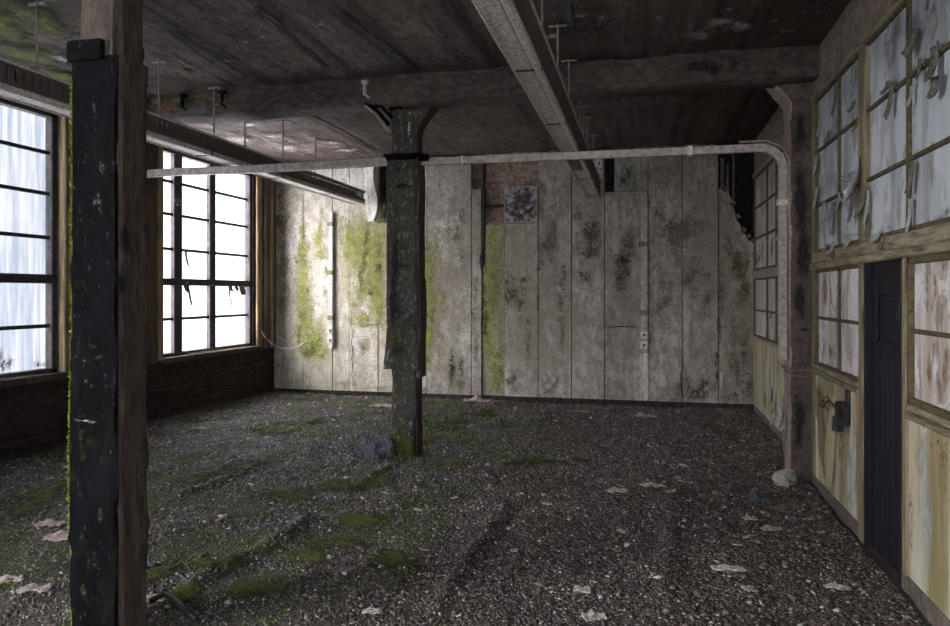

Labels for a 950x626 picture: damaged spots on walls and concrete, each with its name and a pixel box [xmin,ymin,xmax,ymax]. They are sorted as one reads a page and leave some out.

damp [794,170,809,273]
damp [297,324,326,357]
damp [359,225,398,324]
damp [795,286,804,317]